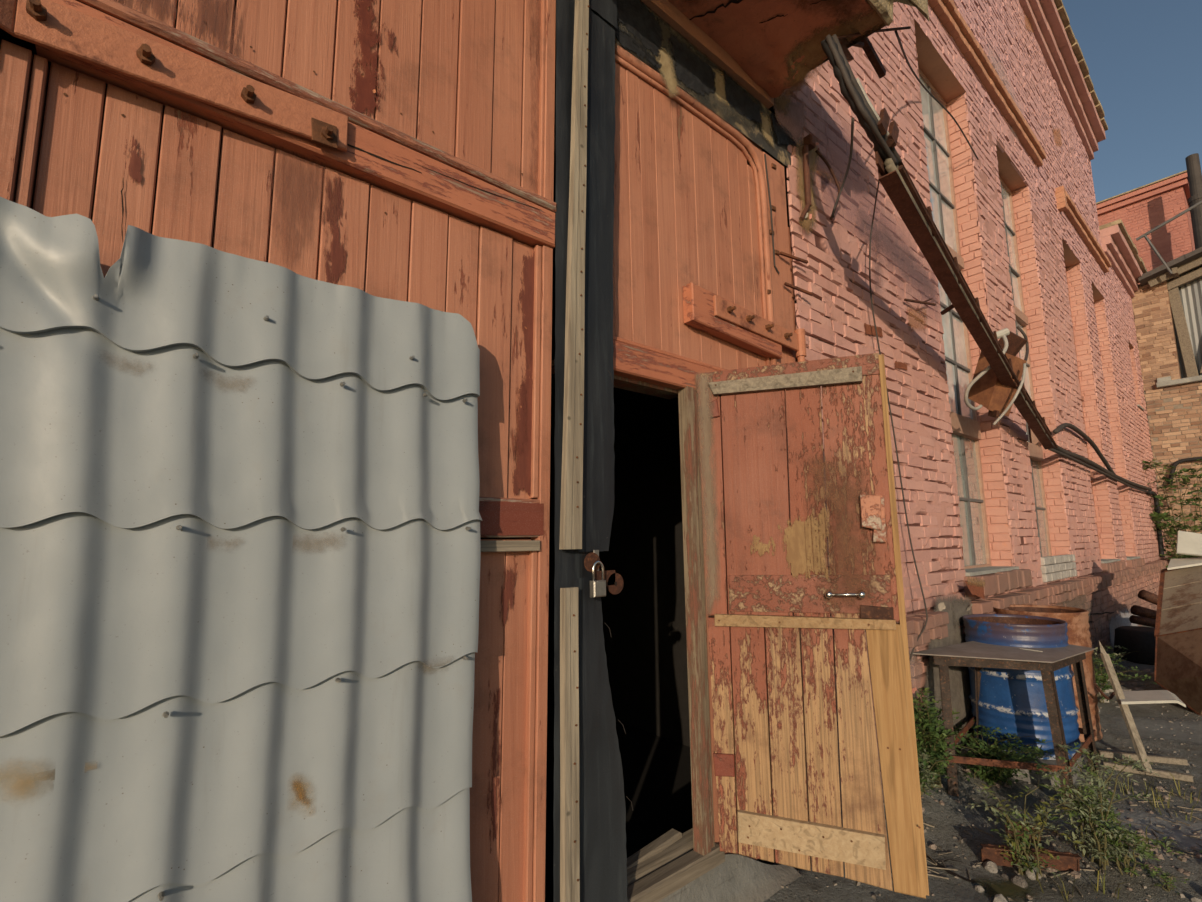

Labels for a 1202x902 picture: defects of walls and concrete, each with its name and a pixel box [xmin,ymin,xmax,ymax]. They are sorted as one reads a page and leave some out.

peeling [116,0,239,56]
peeling [349,0,397,117]
crack [689,0,826,23]
peeling [322,175,347,284]
peeling [750,507,832,580]
peeling [499,565,516,626]
peeling [487,688,501,854]